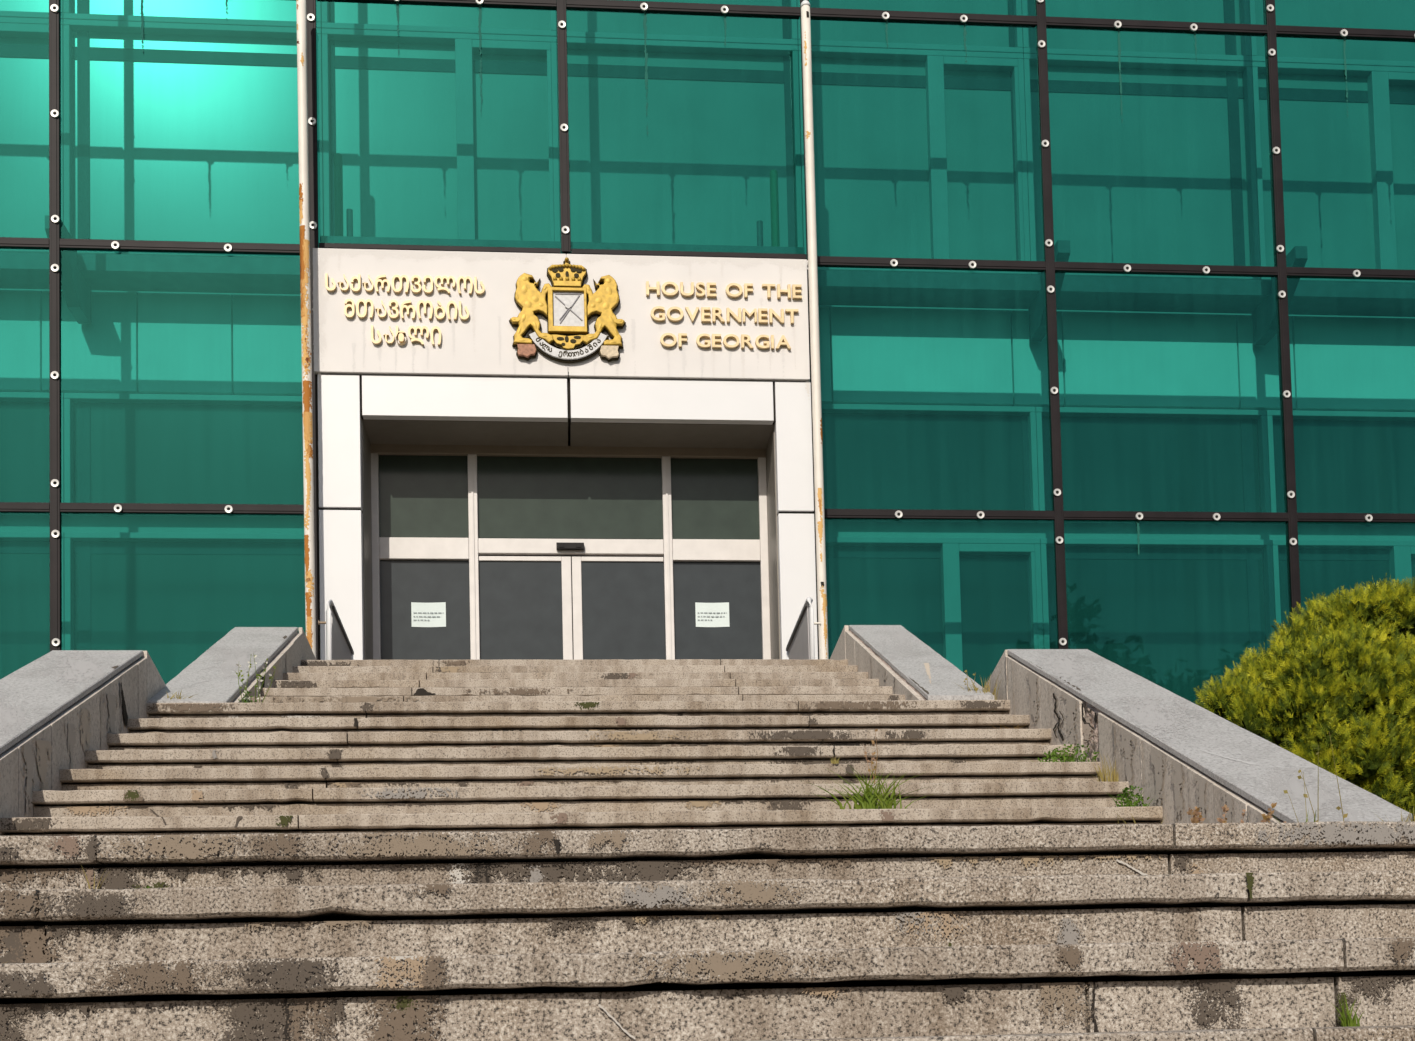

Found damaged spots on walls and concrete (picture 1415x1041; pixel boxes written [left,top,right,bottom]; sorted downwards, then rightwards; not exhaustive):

corrosion [299,183,315,649]
corrosion [819,582,827,658]
crack [1053,693,1143,806]